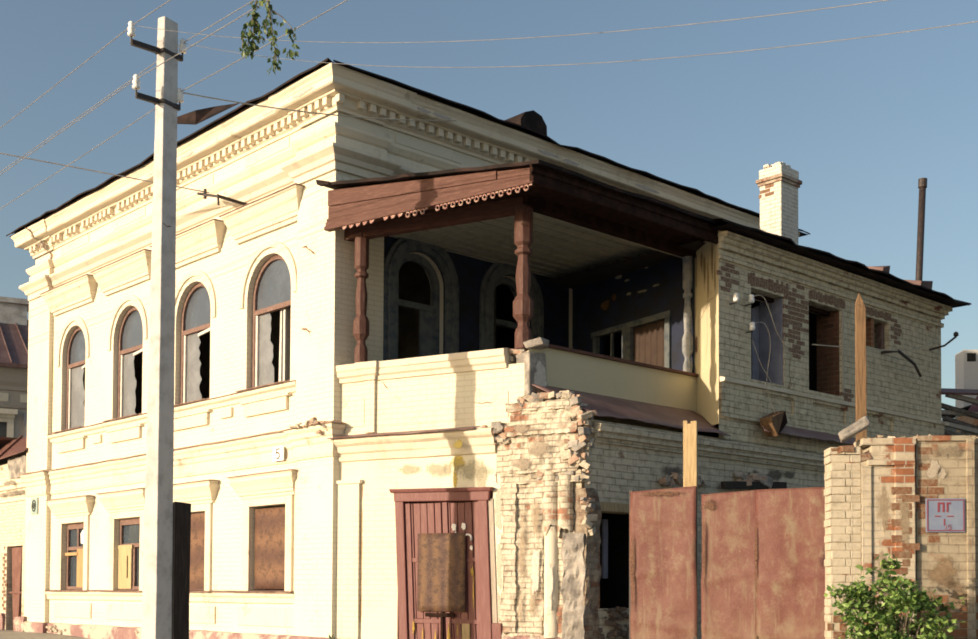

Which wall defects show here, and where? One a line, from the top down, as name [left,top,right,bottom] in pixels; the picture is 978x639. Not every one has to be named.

corrosion [254,507,285,589]
corrosion [417,533,466,612]
spalling [474,349,598,638]
flaking render [872,447,946,574]
flaking render [935,595,978,639]